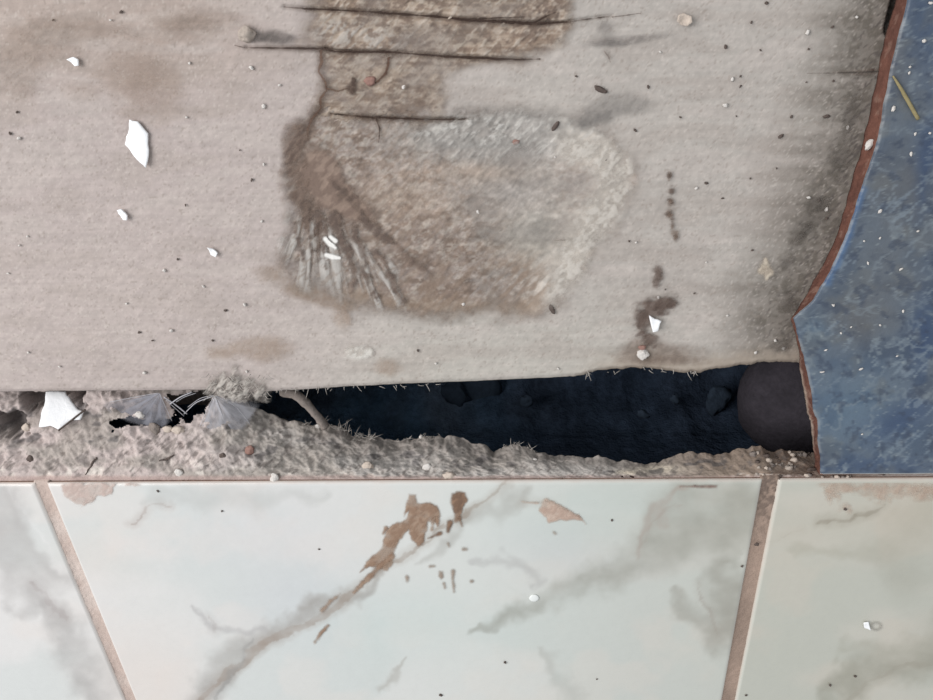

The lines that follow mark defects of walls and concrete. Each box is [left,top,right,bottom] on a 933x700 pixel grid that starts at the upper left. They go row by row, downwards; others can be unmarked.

crack [289,7,638,25]
crack [235,45,540,143]